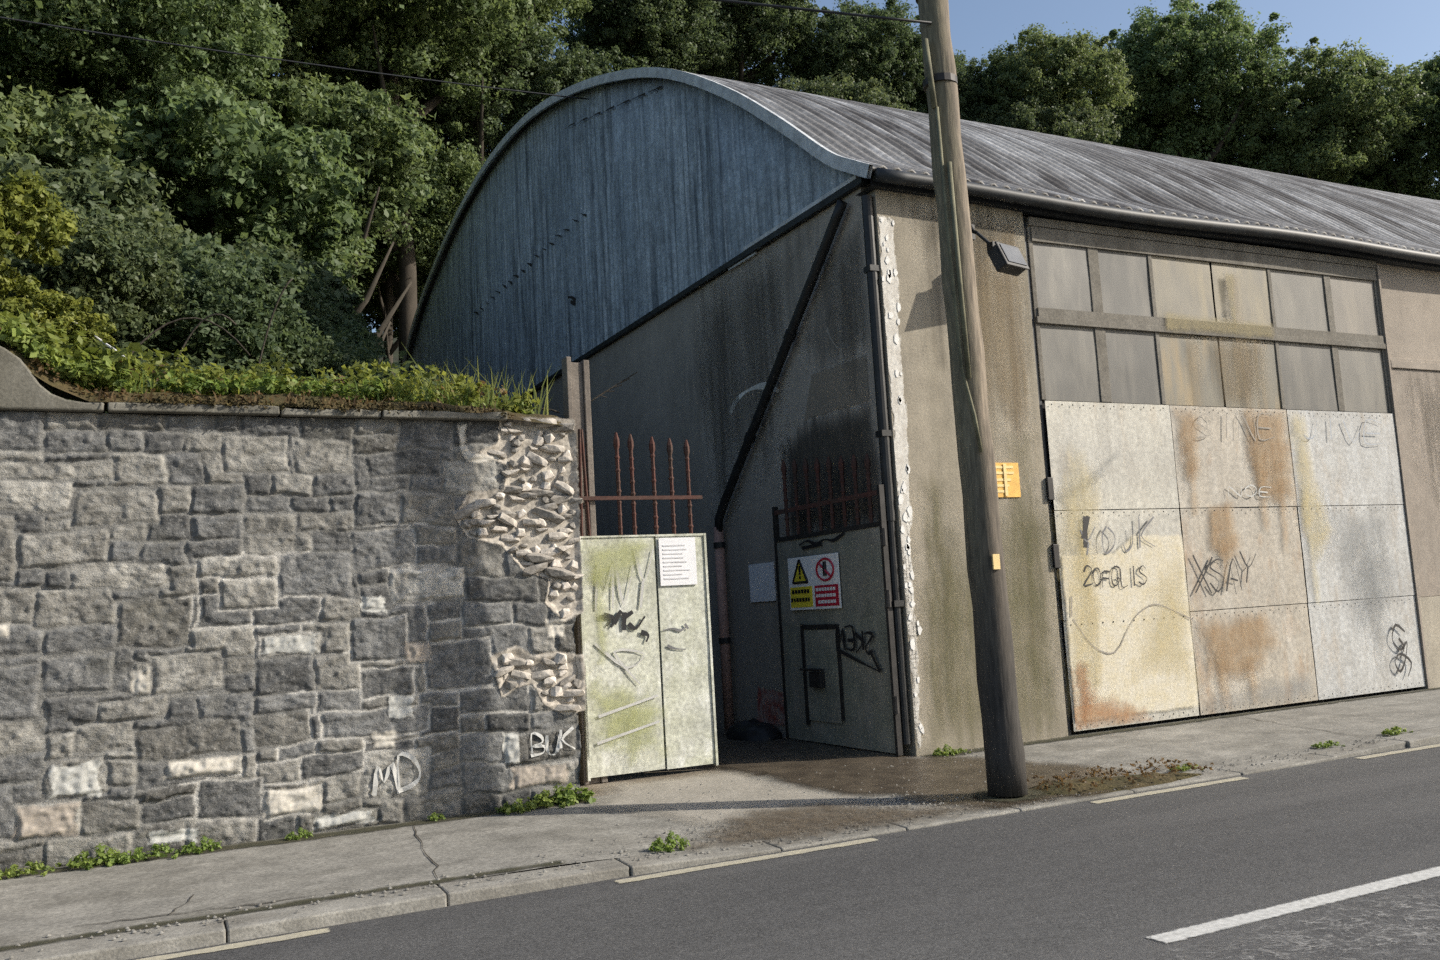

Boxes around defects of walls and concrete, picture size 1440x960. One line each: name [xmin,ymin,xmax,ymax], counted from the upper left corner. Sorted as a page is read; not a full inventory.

spalling [449,417,584,622]
damp [787,411,879,534]
rust [1247,412,1289,512]
spalling [491,645,586,715]
rust [1076,669,1133,728]
crack [414,827,439,878]